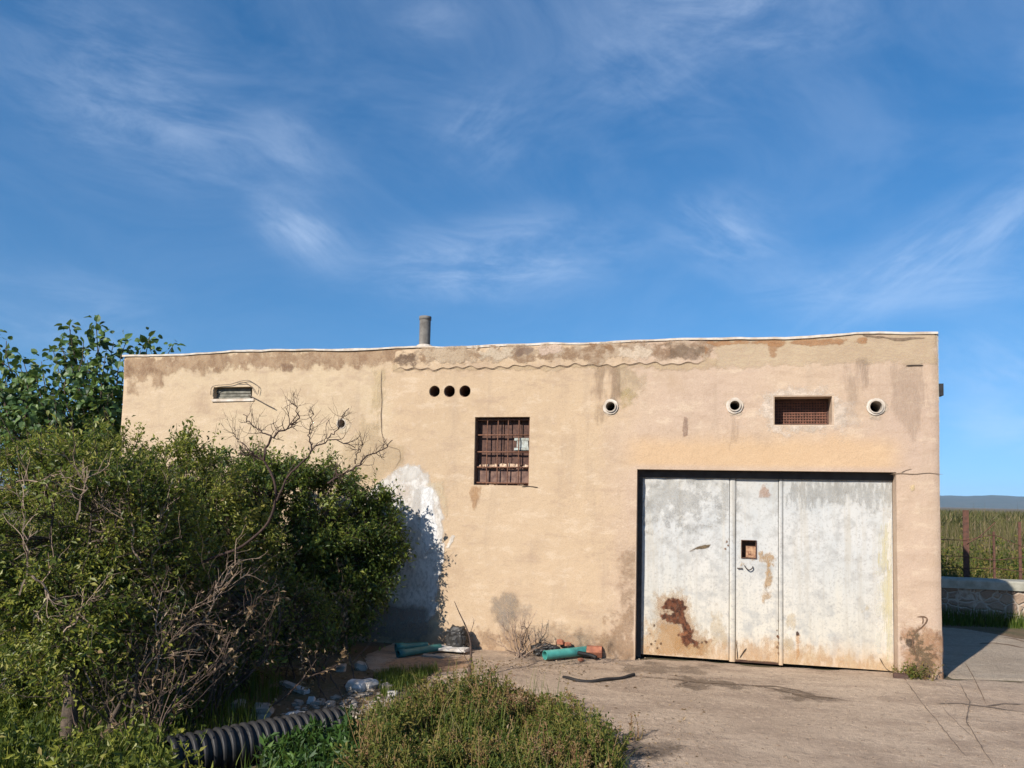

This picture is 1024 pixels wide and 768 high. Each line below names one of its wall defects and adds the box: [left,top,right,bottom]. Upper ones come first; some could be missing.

leakage [124,334,939,416]
crack [380,361,703,466]
flaking render [362,465,455,641]
corrosion [653,598,708,648]